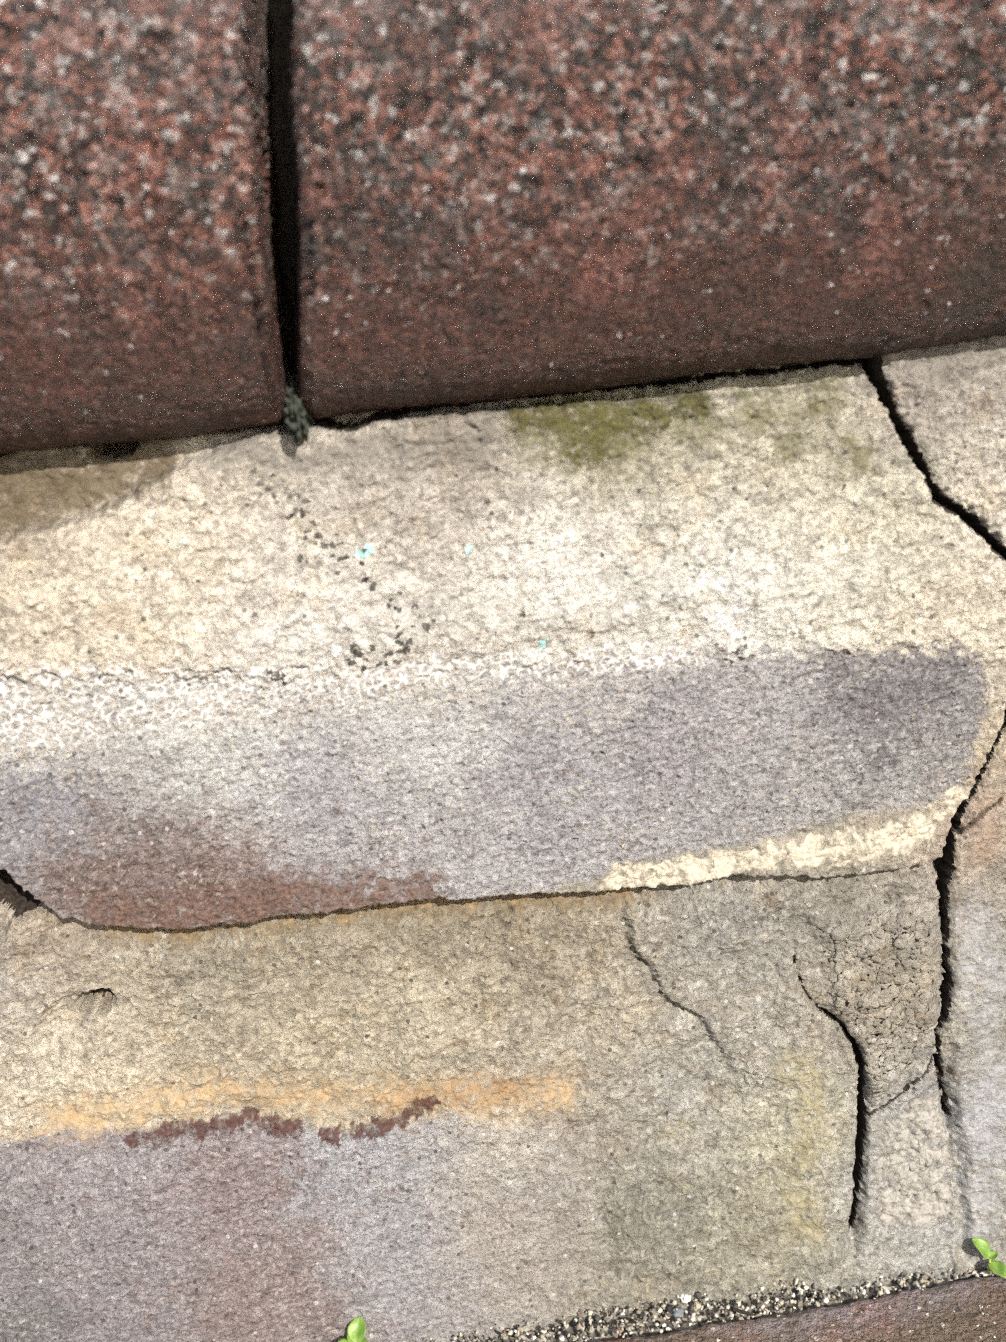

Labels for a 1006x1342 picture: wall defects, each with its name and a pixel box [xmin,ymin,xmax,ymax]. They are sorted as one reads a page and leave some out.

crack [315,356,1006,561]
crack [623,916,697,1015]
crack [793,709,1006,1228]
corrosion [48,1099,116,1136]